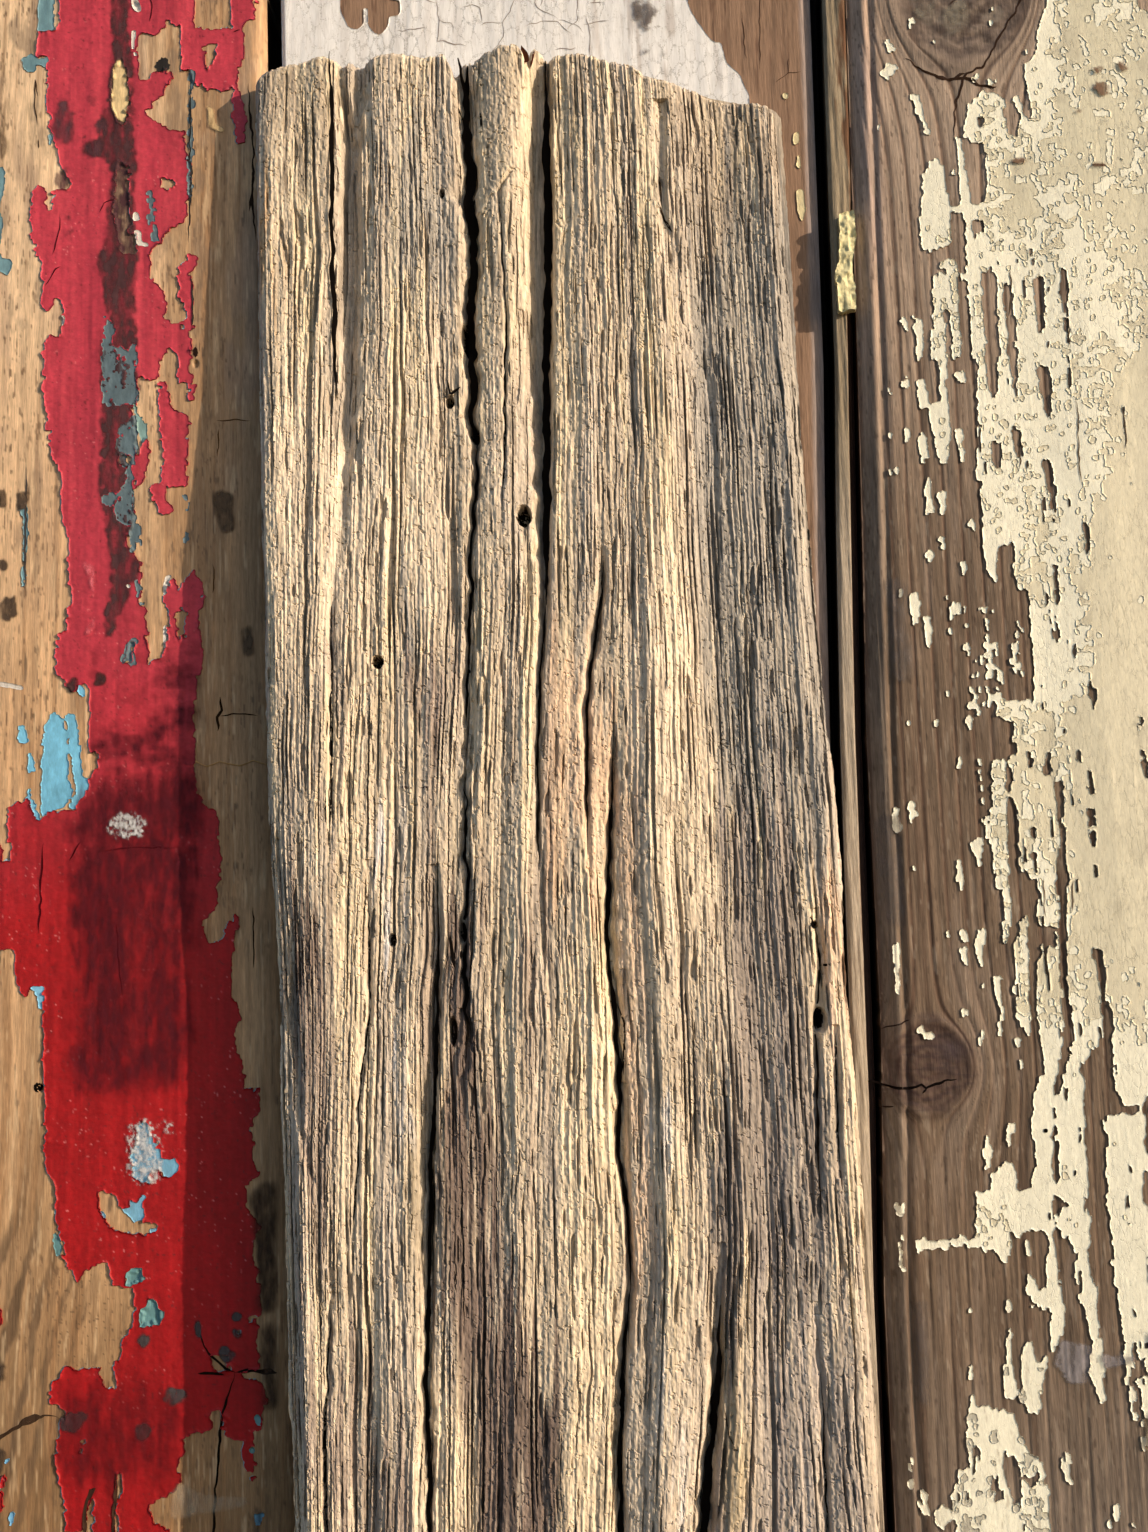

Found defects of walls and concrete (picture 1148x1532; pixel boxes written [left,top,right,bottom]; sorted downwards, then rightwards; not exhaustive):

peeling [281,0,750,104]
peeling [880,39,898,81]
crack [906,0,1021,140]
peeling [834,210,857,315]
crack [399,0,608,871]
peeling [0,0,269,1532]
peeling [887,0,1148,1532]
crack [585,562,632,1532]
crack [198,1336,277,1532]
crack [700,1305,738,1532]